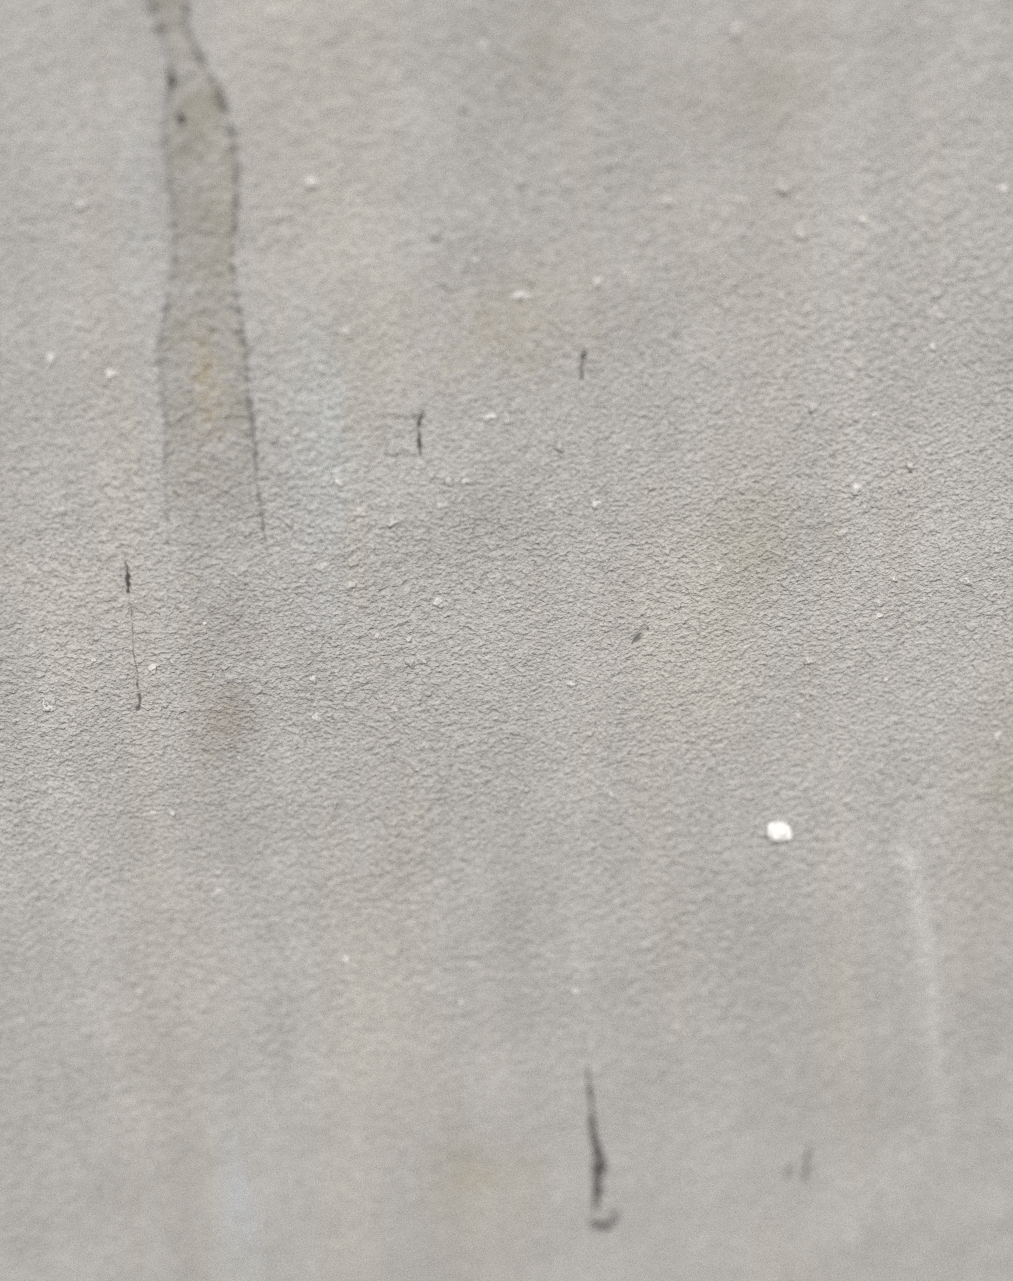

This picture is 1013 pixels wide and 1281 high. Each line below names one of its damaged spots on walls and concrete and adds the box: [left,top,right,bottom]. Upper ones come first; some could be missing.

peeling [148,0,289,998]
crack [587,1068,617,1231]